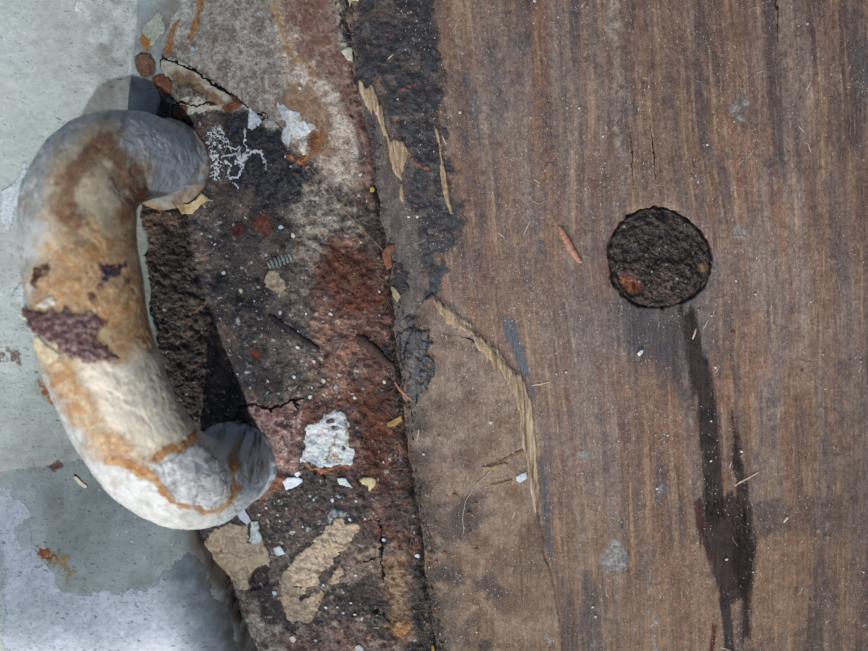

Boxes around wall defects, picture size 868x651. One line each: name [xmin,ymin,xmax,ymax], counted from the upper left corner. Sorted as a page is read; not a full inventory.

crack [160,55,283,130]
corrosion [21,0,437,651]
peeling [283,410,376,491]
damp [616,305,756,651]
peeling [0,487,361,651]